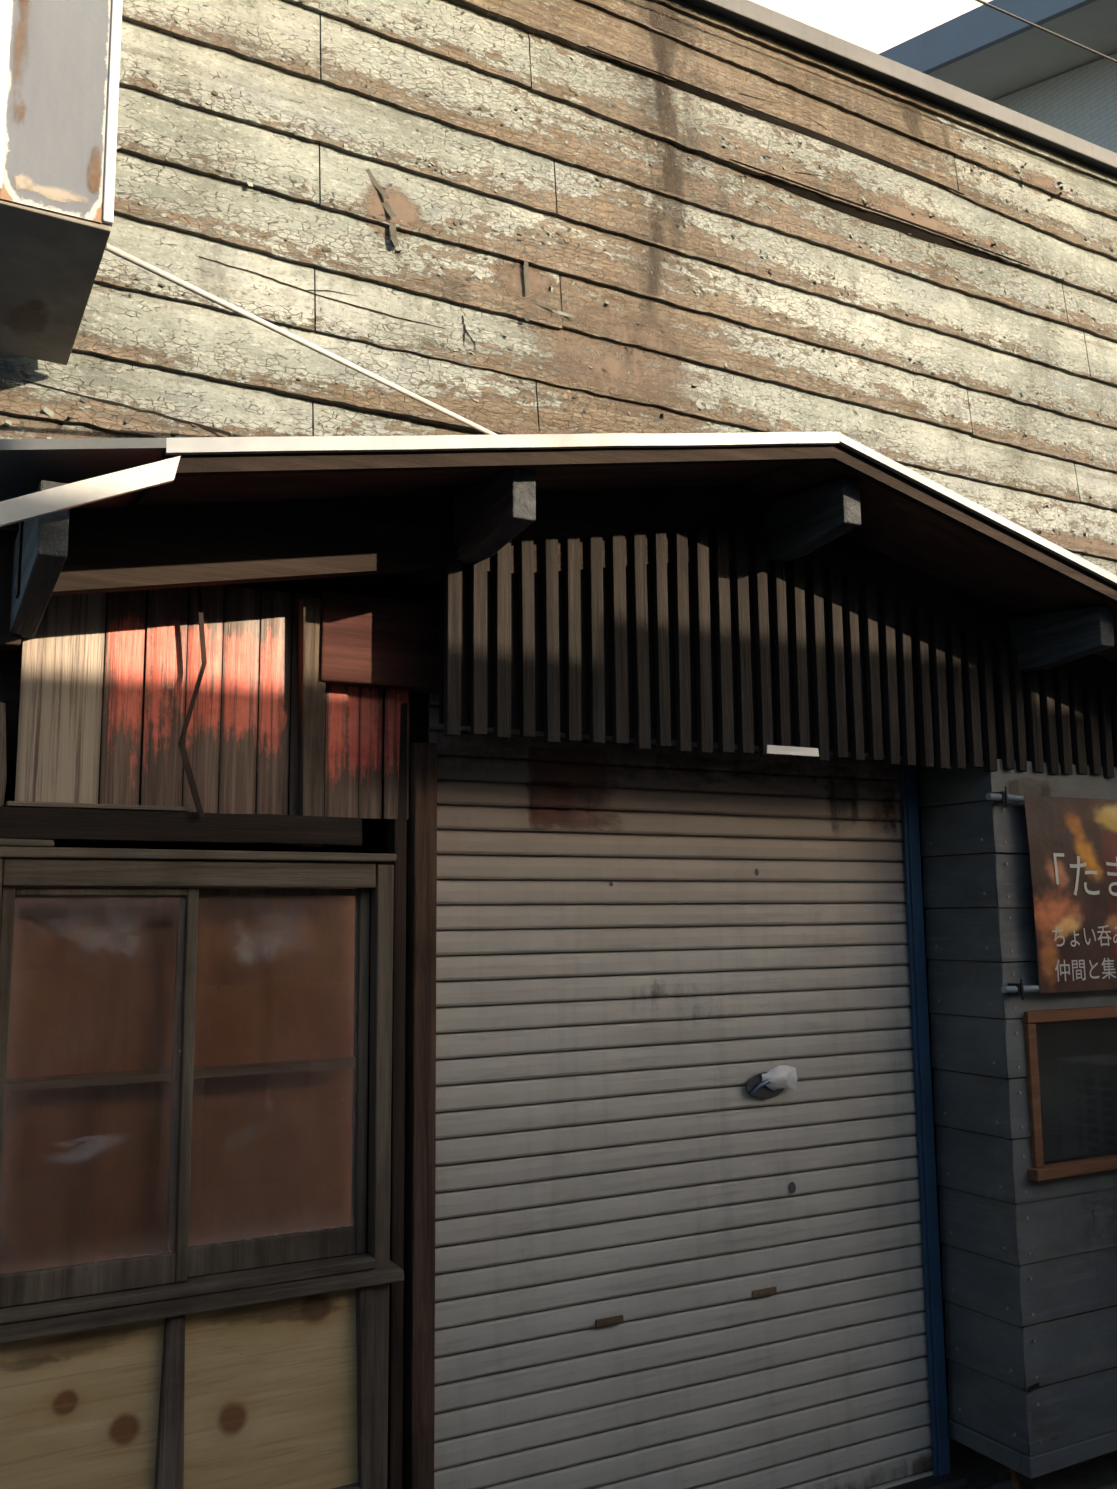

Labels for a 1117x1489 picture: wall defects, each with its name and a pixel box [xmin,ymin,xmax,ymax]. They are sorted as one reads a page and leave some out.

peeling [362,169,422,251]
peeling [861,196,1005,254]
peeling [1018,162,1063,200]
peeling [496,251,705,434]
peeling [42,406,129,439]
peeling [1034,530,1117,554]
rust [526,747,608,828]